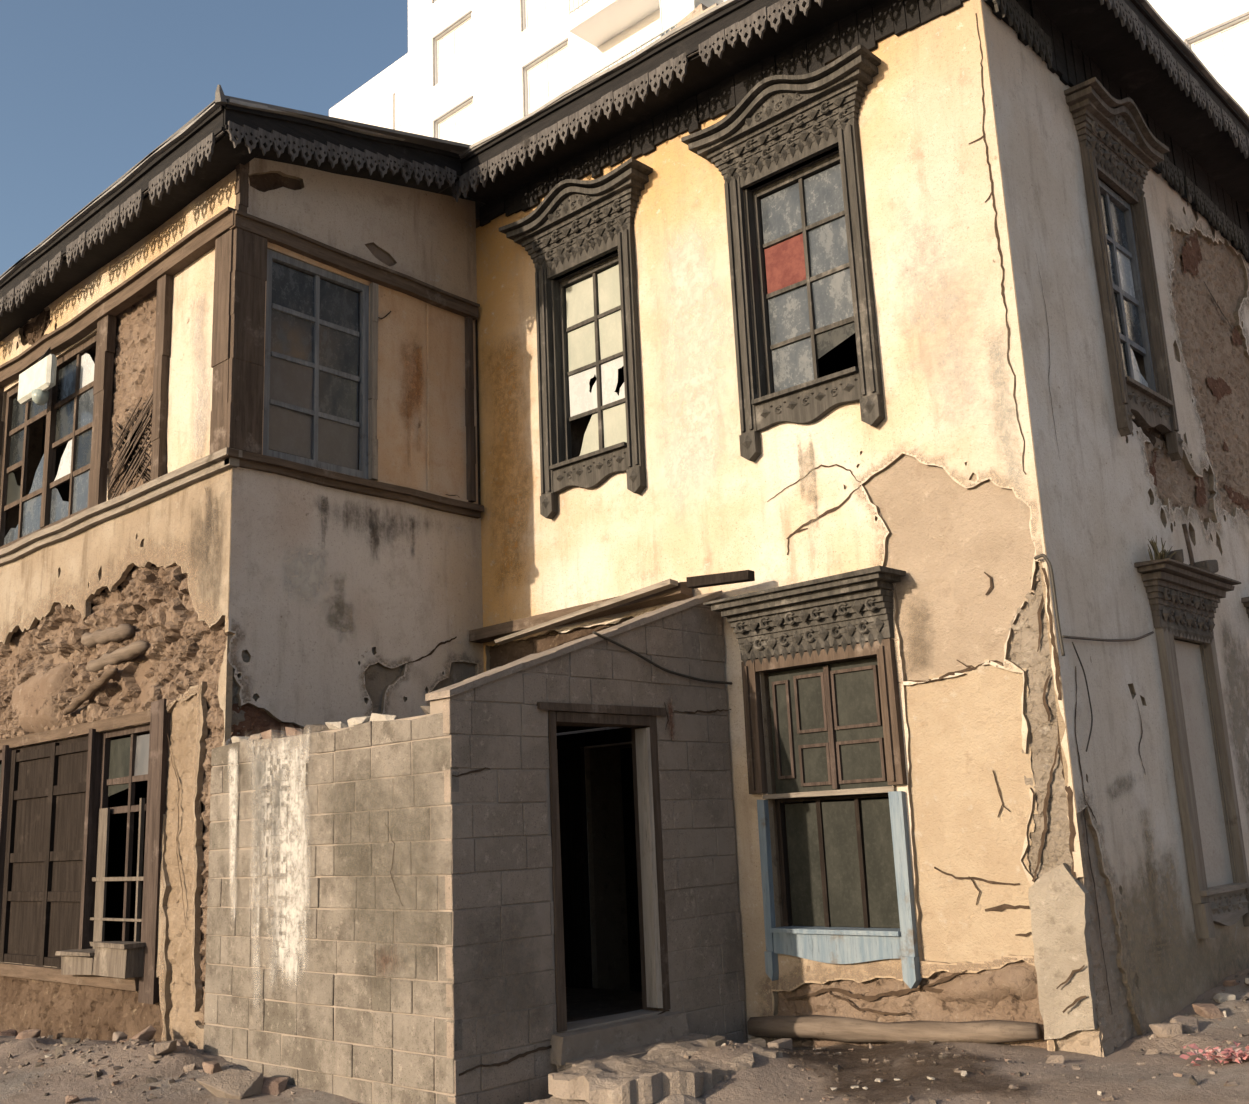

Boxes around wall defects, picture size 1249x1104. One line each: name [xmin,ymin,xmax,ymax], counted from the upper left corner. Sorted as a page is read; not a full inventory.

flaking render [0,621,258,1049]
flaking render [361,647,411,716]
crack [406,636,457,664]
flaking render [425,655,478,693]
crack [767,464,861,555]
crack [898,660,1004,683]
flaking render [762,452,1148,1057]
crack [969,13,1026,475]
crack [934,559,1112,1013]
flaking render [1143,209,1249,549]